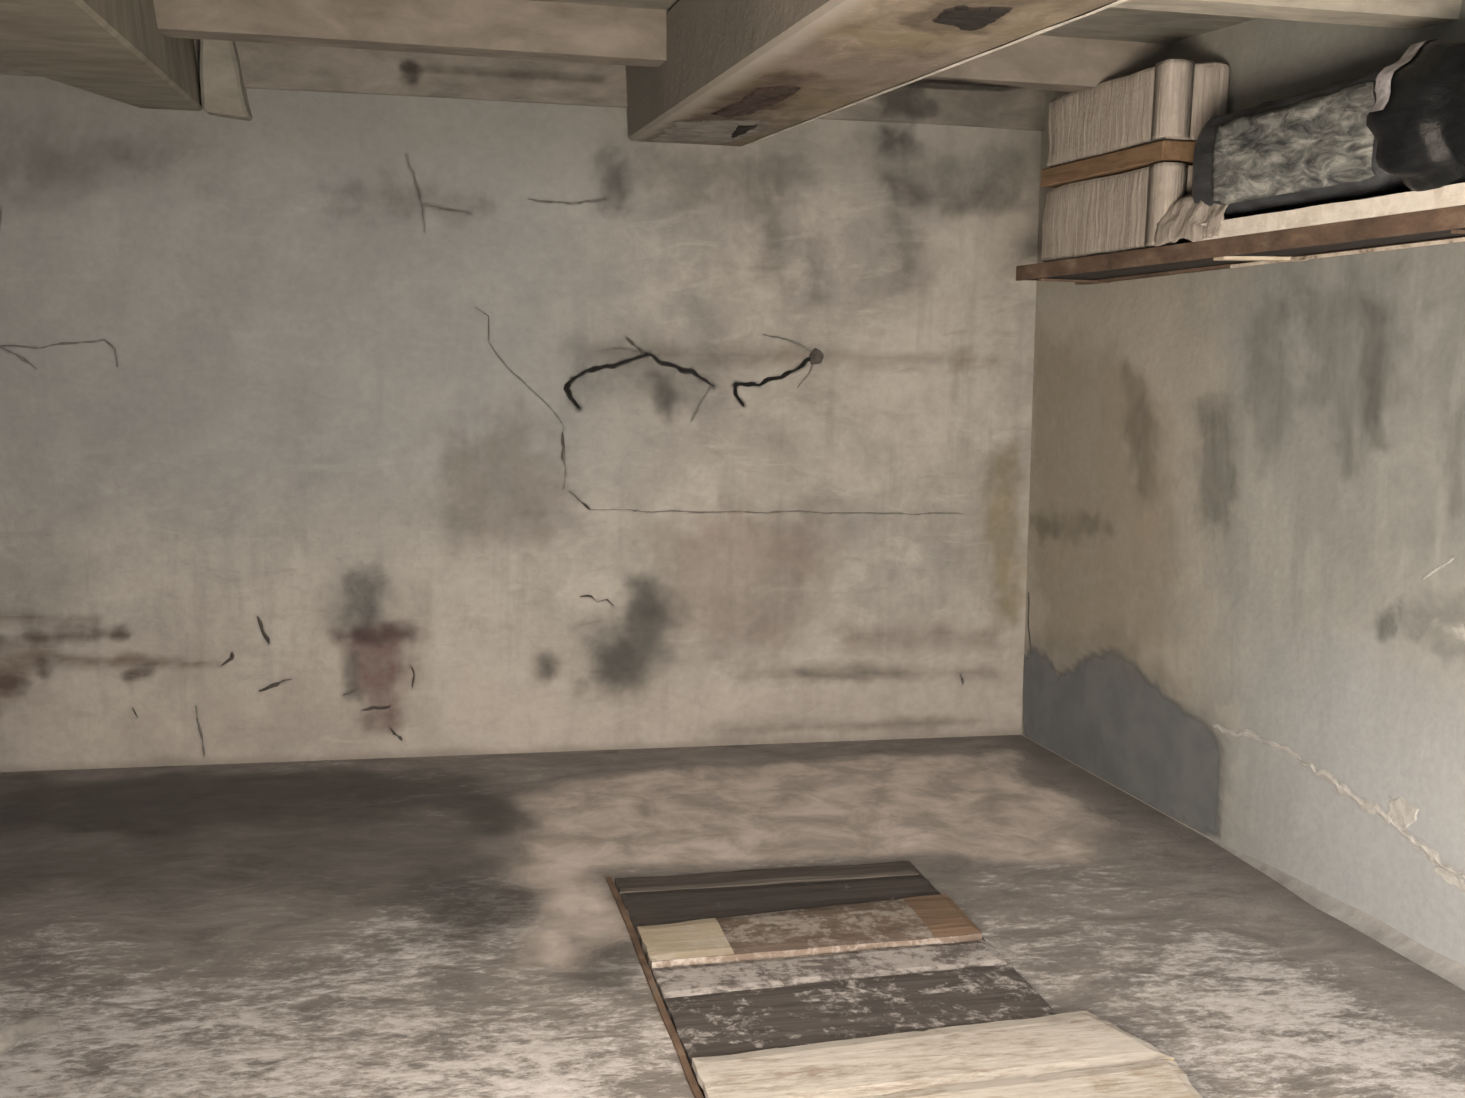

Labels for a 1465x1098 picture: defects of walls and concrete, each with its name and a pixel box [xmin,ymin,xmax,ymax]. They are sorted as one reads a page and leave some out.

spalling [648,0,1128,147]
crack [406,155,471,231]
crack [0,339,118,369]
crack [475,307,961,515]
crack [1215,724,1465,892]